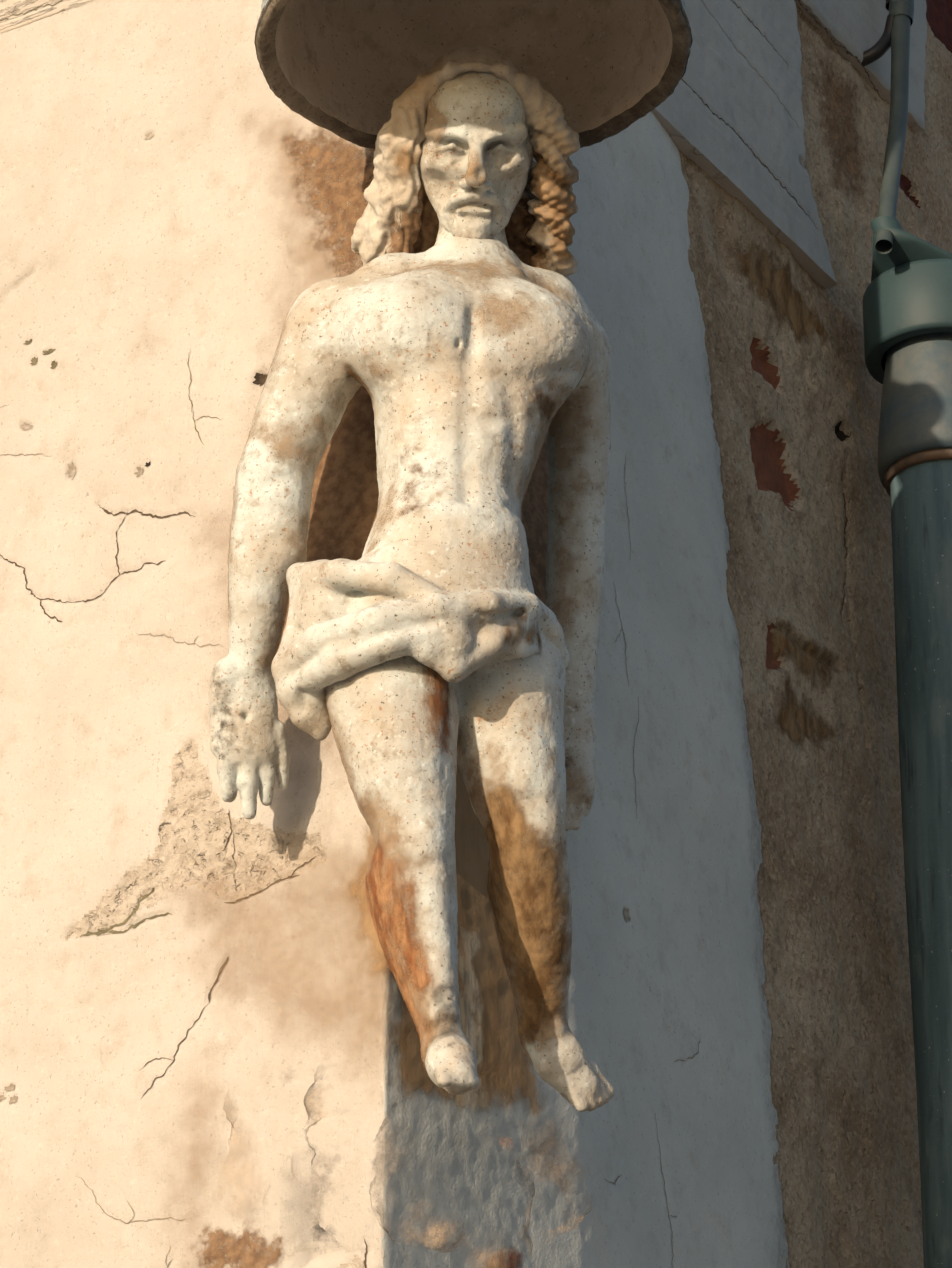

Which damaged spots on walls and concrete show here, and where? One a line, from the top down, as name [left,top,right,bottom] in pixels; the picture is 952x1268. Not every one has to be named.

flaking render [750,421,801,511]
crack [0,507,195,622]
flaking render [766,621,783,670]
spalling [64,739,327,941]
crack [138,957,229,1097]
crack [655,1114,676,1268]
corrosion [486,1249,522,1268]